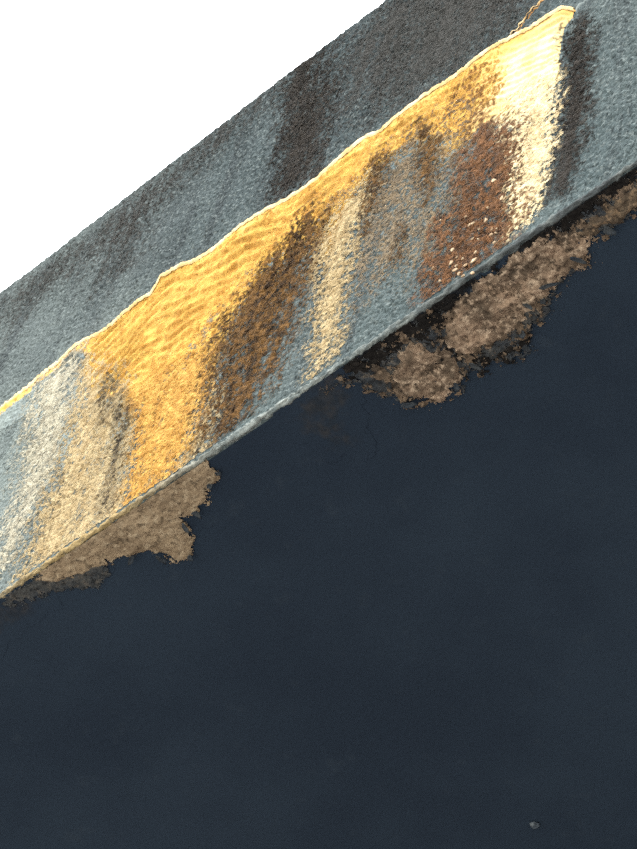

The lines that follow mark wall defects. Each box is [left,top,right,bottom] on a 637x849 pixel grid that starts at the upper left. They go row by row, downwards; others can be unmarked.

crack [510,0,544,35]
rust [11,45,533,582]
peeling [319,170,637,410]
peeling [1,460,221,607]